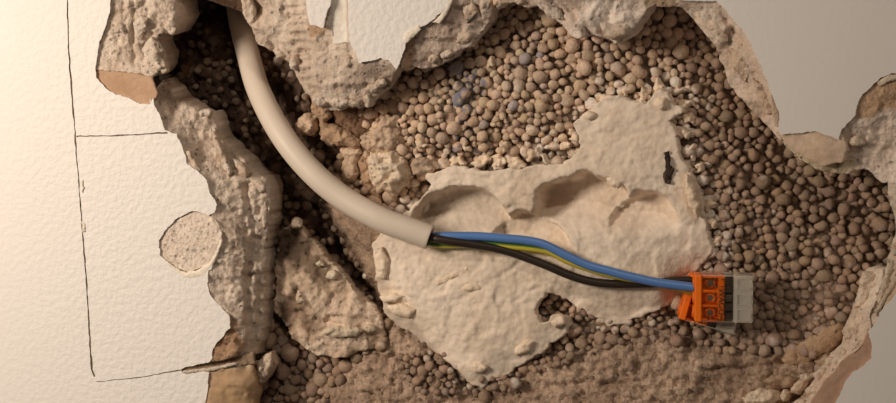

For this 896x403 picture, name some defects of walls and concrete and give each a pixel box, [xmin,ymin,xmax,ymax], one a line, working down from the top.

crack [67,0,257,382]
spalling [96,0,303,403]
spalling [209,0,896,403]